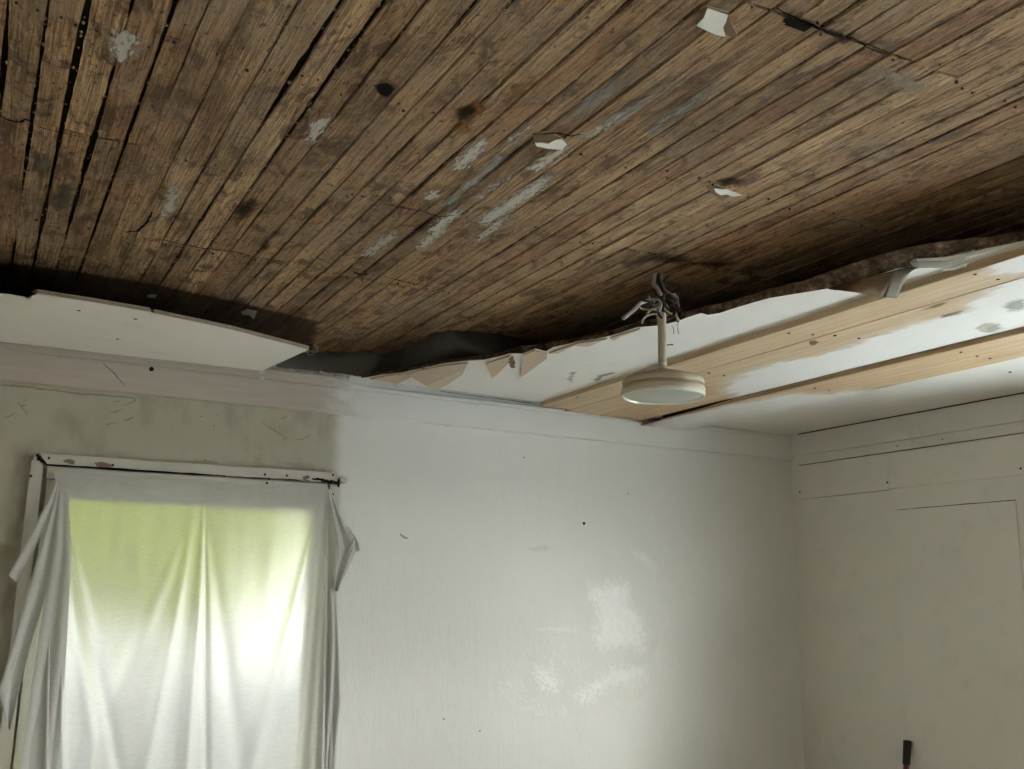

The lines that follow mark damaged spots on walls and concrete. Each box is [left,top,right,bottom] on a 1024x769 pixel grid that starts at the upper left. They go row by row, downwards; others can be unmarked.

crack [776,7,945,94]
damp [458,106,475,120]
spalling [361,232,1024,378]